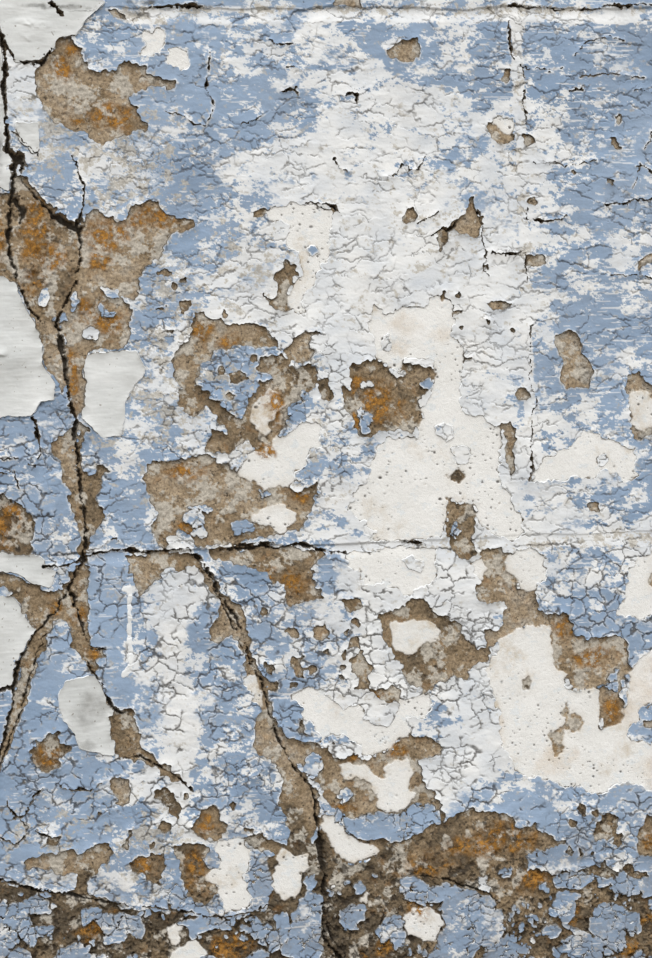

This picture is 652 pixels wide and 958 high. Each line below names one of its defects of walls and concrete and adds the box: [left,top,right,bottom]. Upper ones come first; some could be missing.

crack [149,2,201,10]
peeling [34,28,189,146]
flaking render [254,202,338,314]
peeling [402,207,417,223]
peeling [436,197,483,252]
peeling [524,254,546,266]
peeling [634,254,652,275]
spalling [0,171,195,762]
crack [0,33,348,958]
spalling [0,291,652,958]